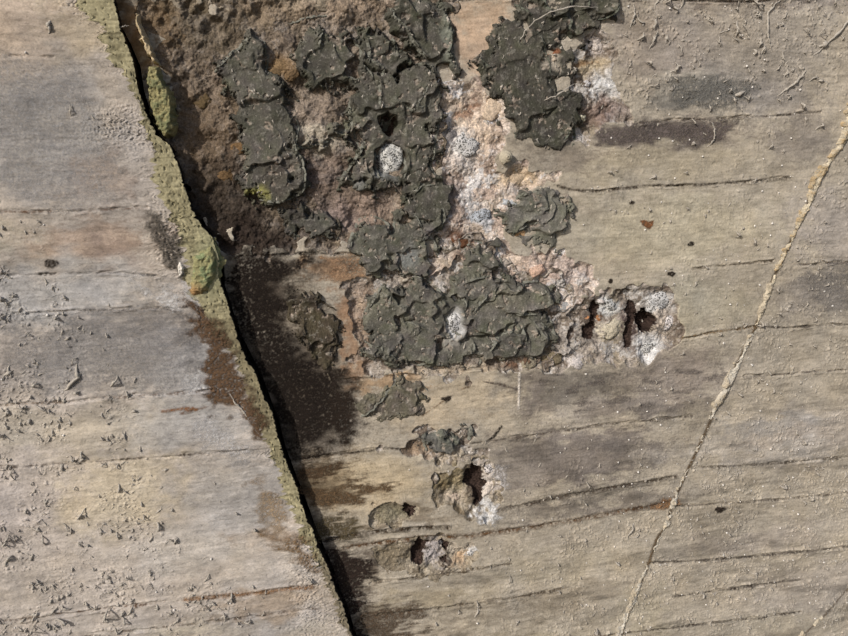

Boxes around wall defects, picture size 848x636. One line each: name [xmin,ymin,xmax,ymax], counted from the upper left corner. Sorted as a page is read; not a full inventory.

spalling [431,0,461,43]
spalling [135,0,426,263]
spalling [569,28,633,147]
damp [596,119,738,146]
spalling [340,63,685,386]
crack [319,103,848,636]
damp [157,242,432,636]
spalling [368,502,419,530]
spalling [371,532,482,583]
spalling [400,424,504,526]